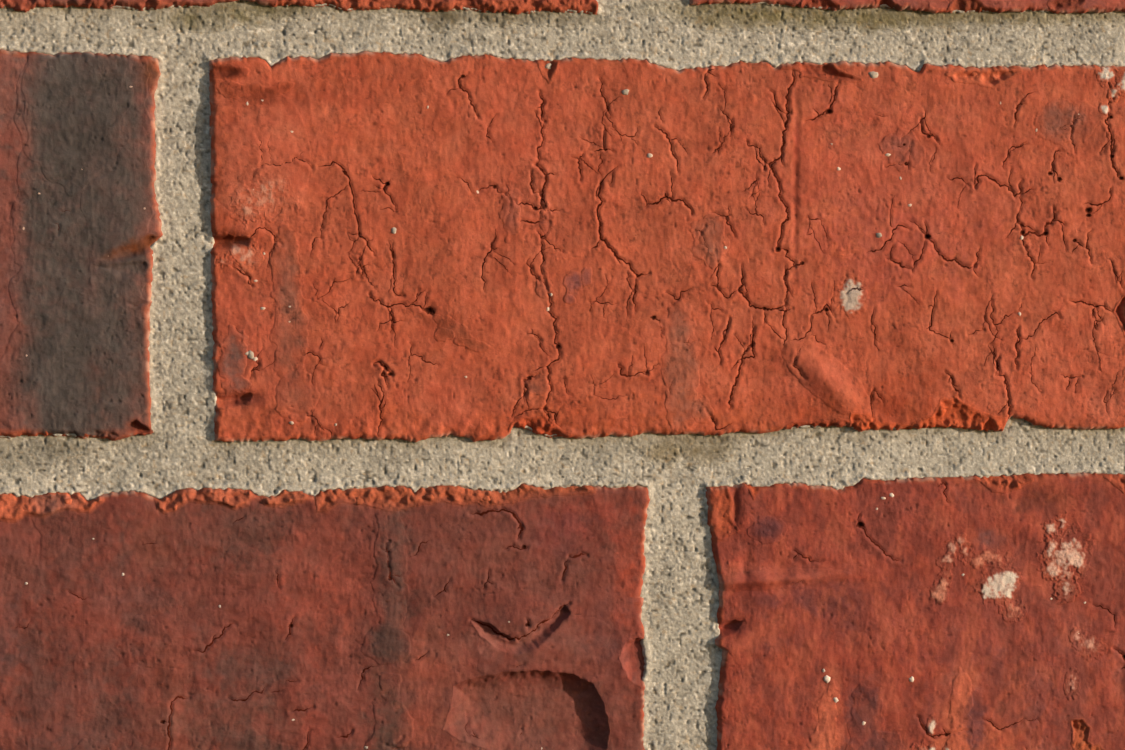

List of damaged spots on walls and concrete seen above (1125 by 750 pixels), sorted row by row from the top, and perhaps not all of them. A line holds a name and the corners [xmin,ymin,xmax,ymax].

crack [449,74,496,142]
crack [234,227,278,285]
crack [251,136,439,436]
crack [457,69,880,430]
crack [866,82,1124,422]
crack [235,327,275,379]
crack [472,553,586,667]
damp [924,532,1028,623]
damp [1036,511,1095,605]
damp [844,683,951,750]